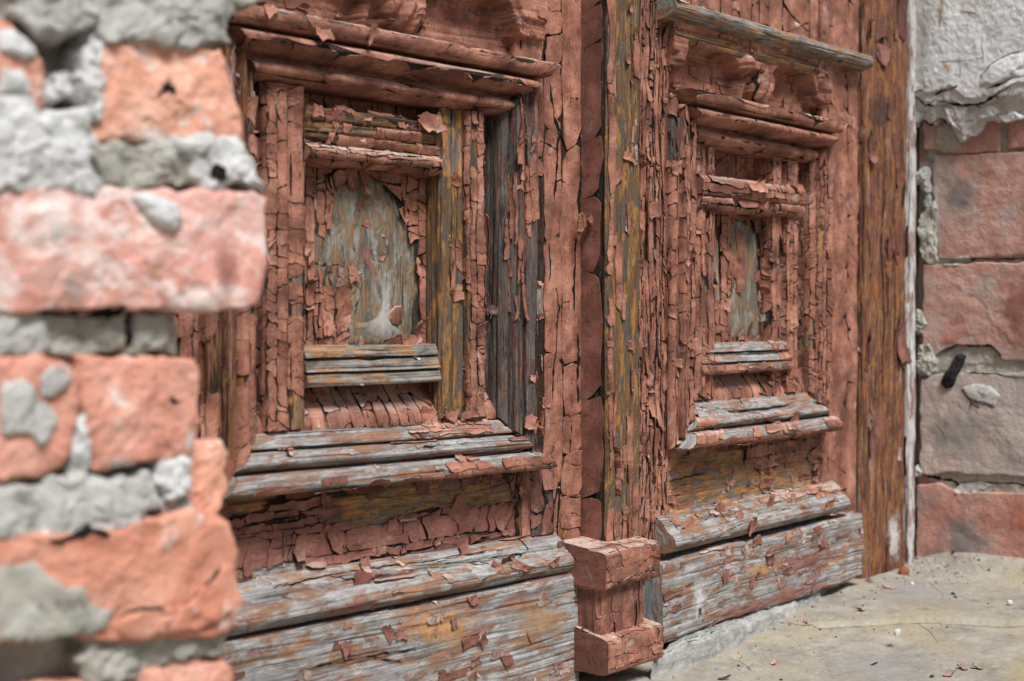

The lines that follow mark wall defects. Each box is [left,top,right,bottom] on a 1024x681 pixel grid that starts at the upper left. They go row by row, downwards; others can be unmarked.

peeling [305,96,463,187]
peeling [728,180,768,195]
flaking render [940,86,1024,137]
peeling [304,176,426,345]
crack [514,84,582,550]
peeling [714,220,775,342]
peeling [391,405,487,451]
peeling [524,374,555,466]
peeling [696,399,824,430]
peeling [317,471,527,542]
peeling [668,444,840,590]
spalling [112,541,561,645]